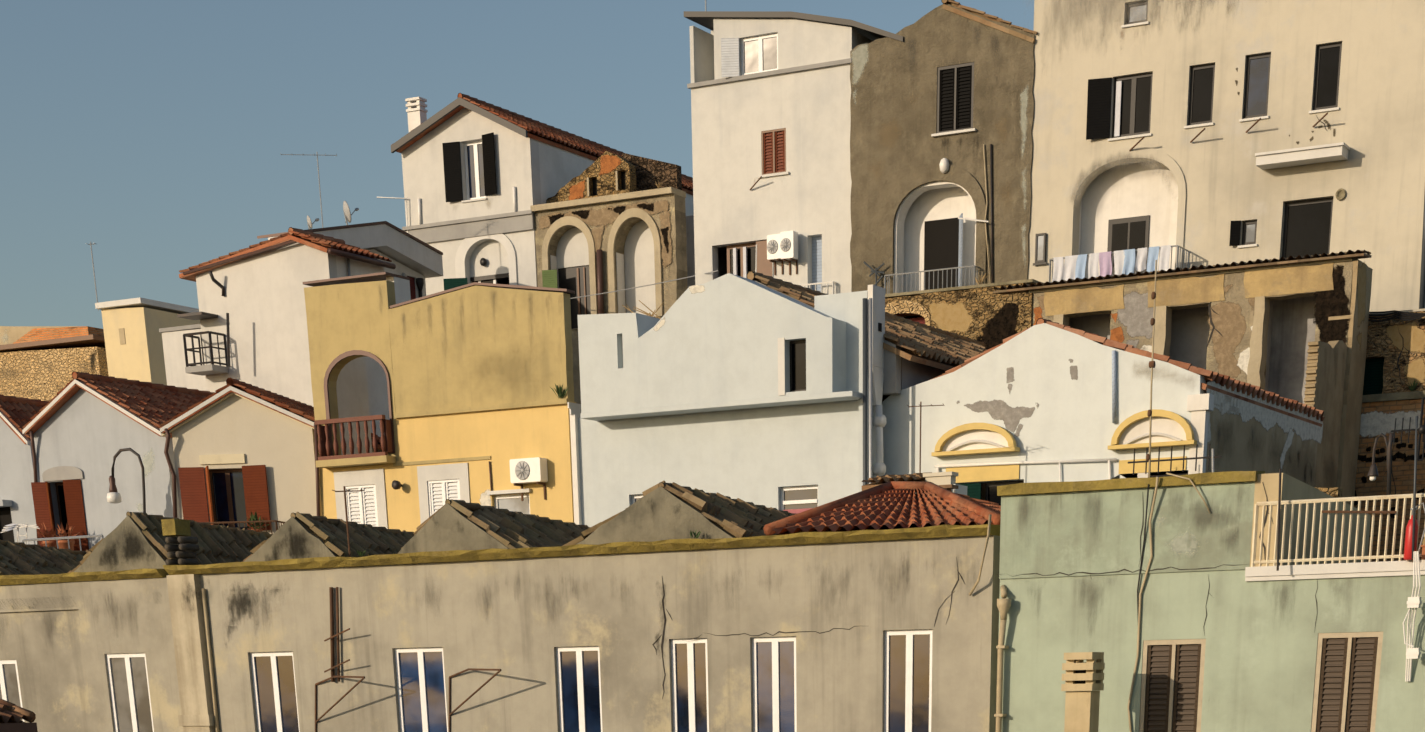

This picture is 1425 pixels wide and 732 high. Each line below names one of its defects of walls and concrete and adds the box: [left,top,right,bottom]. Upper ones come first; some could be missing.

spalling [1110,292,1156,352]
spalling [957,367,1039,437]
peeling [1207,284,1323,469]
peeling [1354,410,1425,506]
leakage [228,589,252,628]
crack [652,577,856,699]